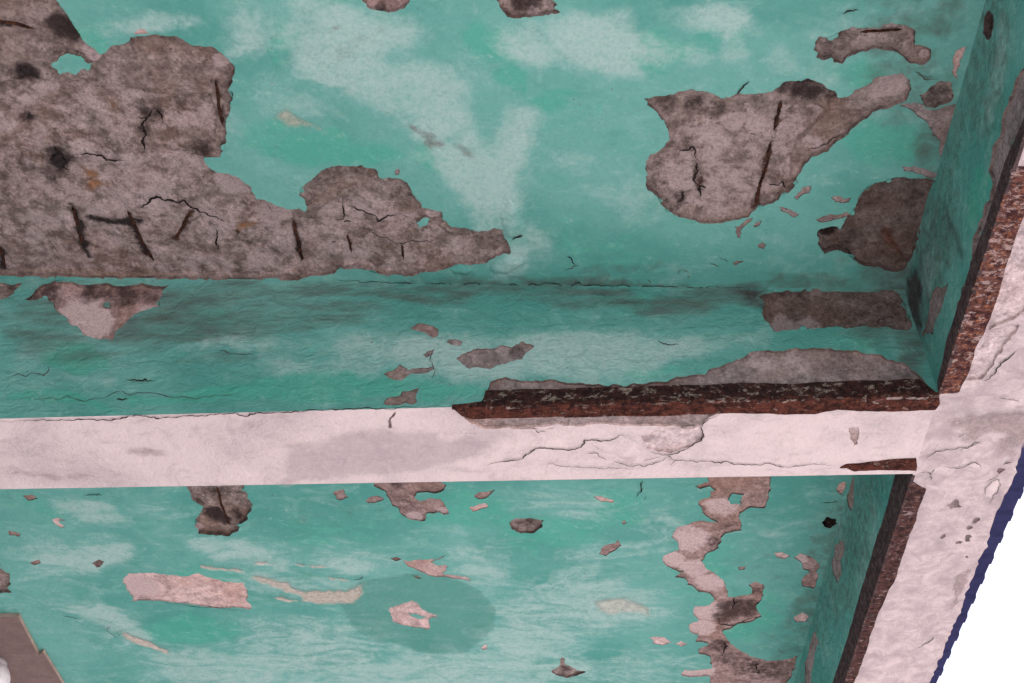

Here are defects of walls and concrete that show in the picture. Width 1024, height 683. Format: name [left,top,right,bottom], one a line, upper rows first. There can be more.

spalling [0,0,511,340]
spalling [645,23,967,238]
crack [134,195,225,251]
crack [338,204,436,244]
spalling [816,166,937,272]
spalling [759,284,948,336]
spalling [384,323,929,428]
spalling [187,485,253,537]
peeling [366,482,449,521]
crack [487,415,844,503]
peeling [123,573,252,609]
peeling [650,476,819,683]